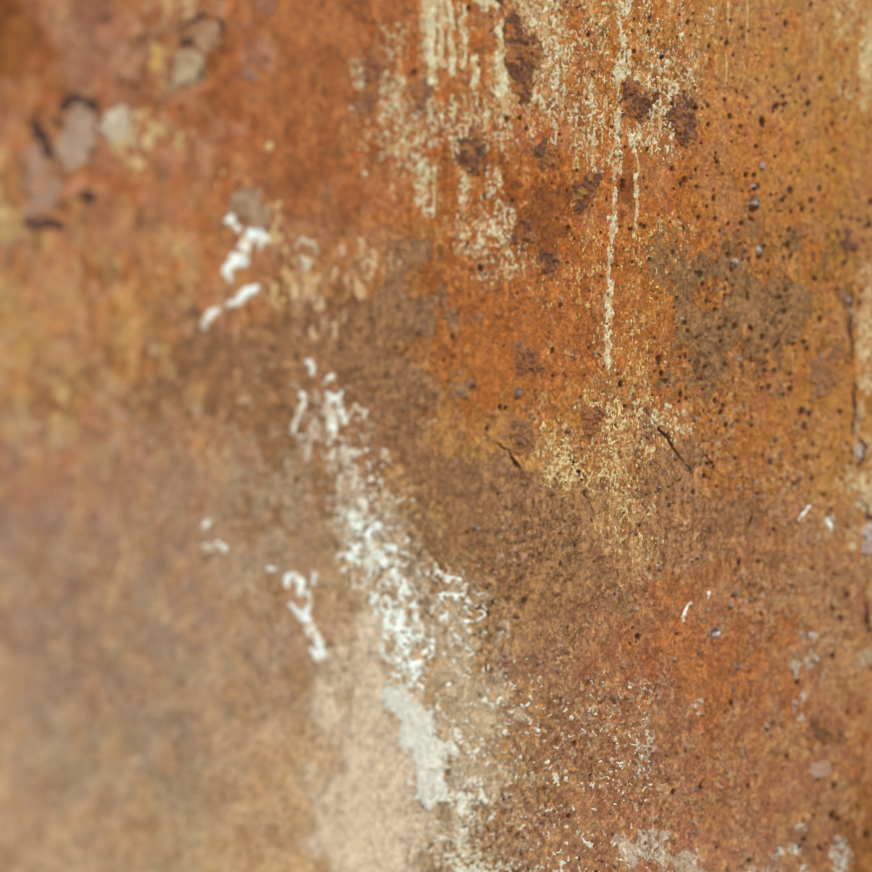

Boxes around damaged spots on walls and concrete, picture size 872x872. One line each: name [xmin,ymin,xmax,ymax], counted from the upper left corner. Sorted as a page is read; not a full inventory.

peeling [149,0,221,94]
corrosion [496,0,547,109]
corrosion [617,78,701,149]
peeling [18,102,185,222]
efflorescence [222,214,270,283]
efflorescence [200,284,261,330]
corrosion [422,137,635,456]
crack [496,442,539,512]
crack [568,455,596,519]
water stain [282,358,708,872]
corrosion [605,562,847,761]
efflorescence [829,835,853,872]